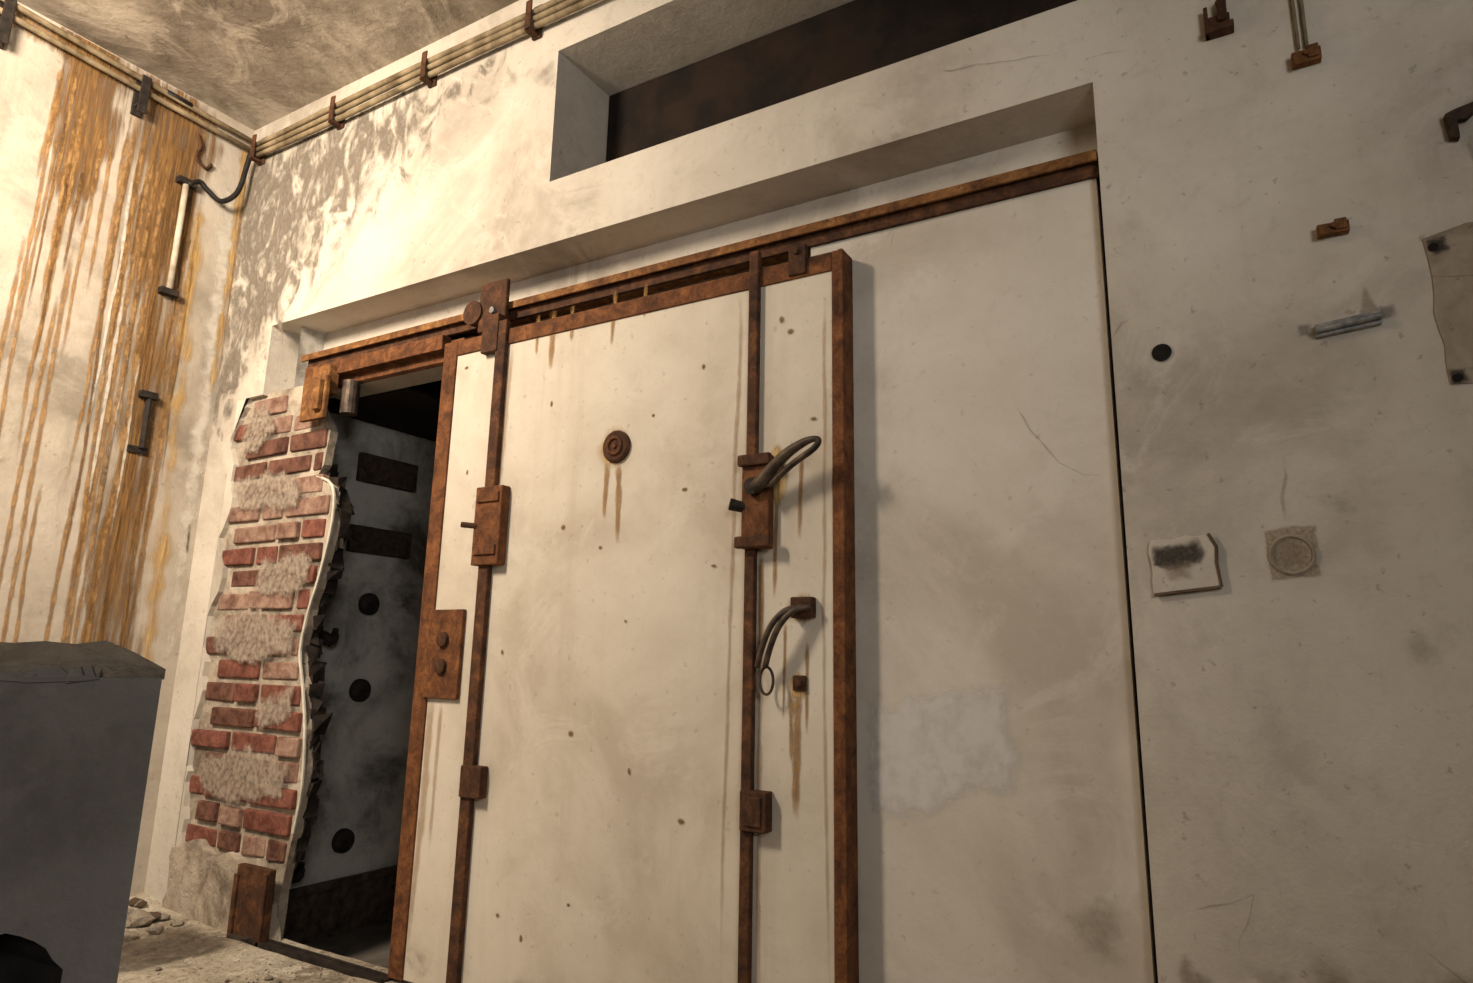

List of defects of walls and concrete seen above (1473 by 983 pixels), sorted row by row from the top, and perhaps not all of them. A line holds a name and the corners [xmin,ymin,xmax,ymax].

rust [0,10,222,659]
rust [211,151,248,390]
damp [176,84,471,577]
rust [535,310,574,364]
rust [603,454,624,533]
rust [759,447,803,630]
flaking render [162,386,355,941]
rust [783,618,809,805]